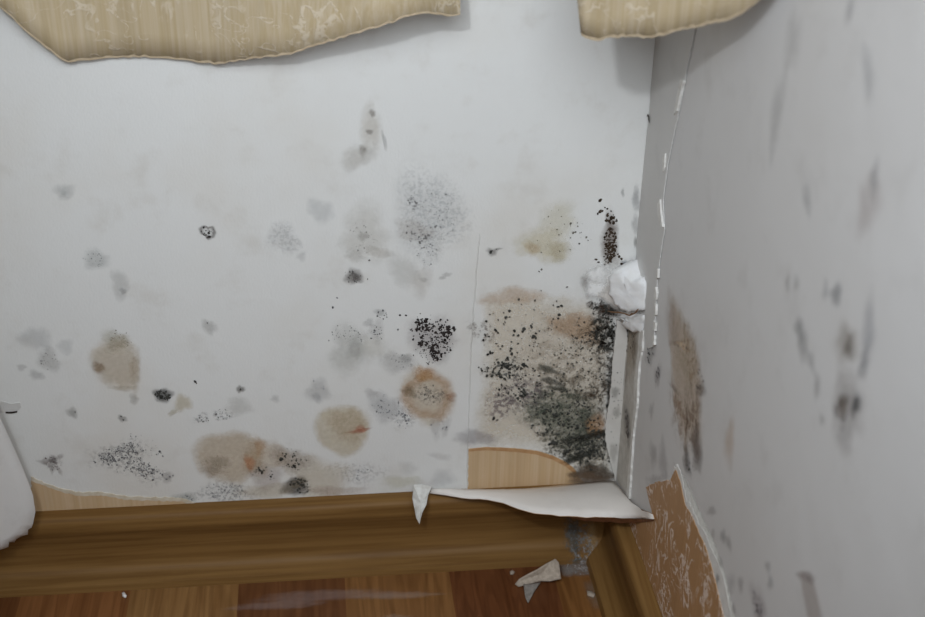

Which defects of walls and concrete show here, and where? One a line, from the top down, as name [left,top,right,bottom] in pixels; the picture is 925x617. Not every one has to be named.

leakage [406,193,454,266]
leakage [391,313,456,368]
leakage [478,290,629,483]
leakage [93,433,174,481]